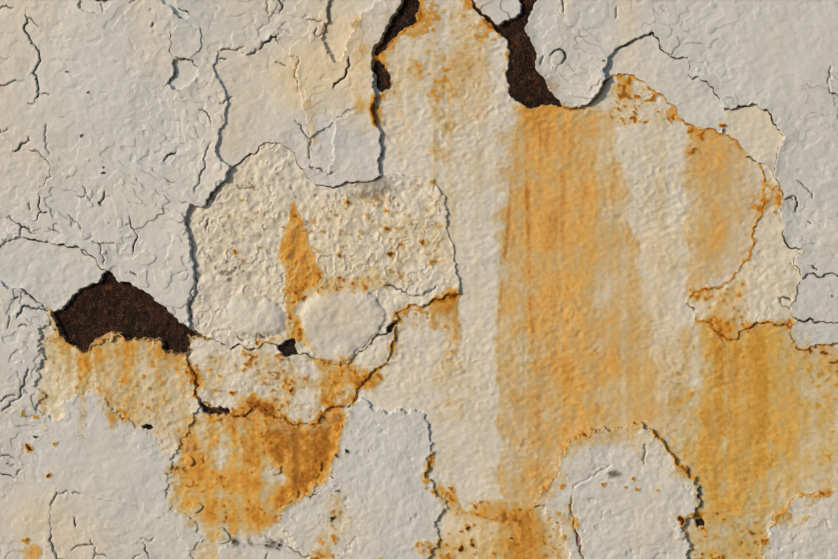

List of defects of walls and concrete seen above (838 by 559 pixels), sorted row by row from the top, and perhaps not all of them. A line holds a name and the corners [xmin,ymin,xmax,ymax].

crack [2,5,49,103]
crack [219,36,300,86]
crack [333,58,350,89]
peeling [0,133,51,223]
crack [7,124,81,234]
crack [8,288,50,327]
peeling [0,237,108,312]
peeling [36,0,543,559]
corrosion [356,0,838,559]
peeling [568,32,838,559]
corrosion [46,192,461,559]
peeling [535,496,571,559]